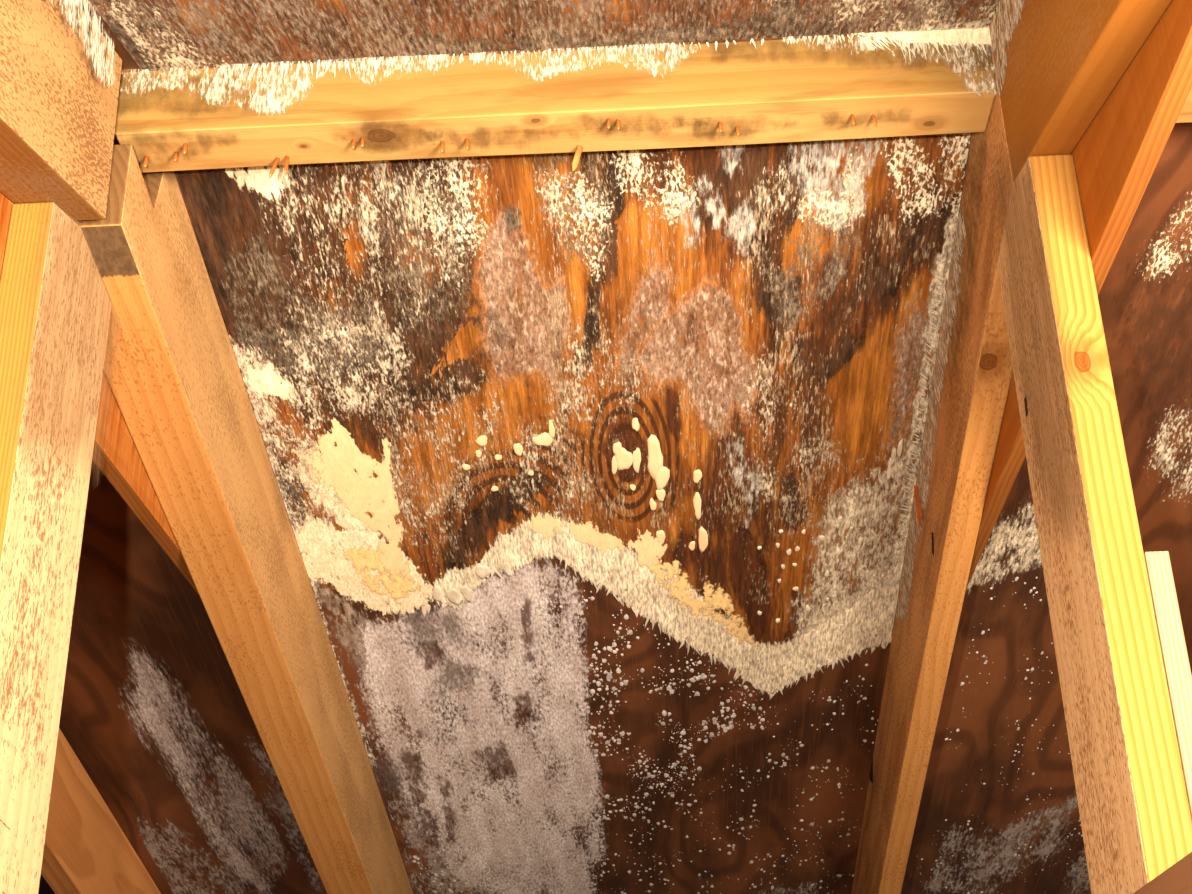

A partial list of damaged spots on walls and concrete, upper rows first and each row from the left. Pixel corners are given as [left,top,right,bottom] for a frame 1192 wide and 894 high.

leakage [52,0,1024,115]
leakage [175,133,971,894]
leakage [967,173,1076,609]
leakage [1116,192,1192,504]
leakage [123,649,323,894]
leakage [917,788,1090,894]